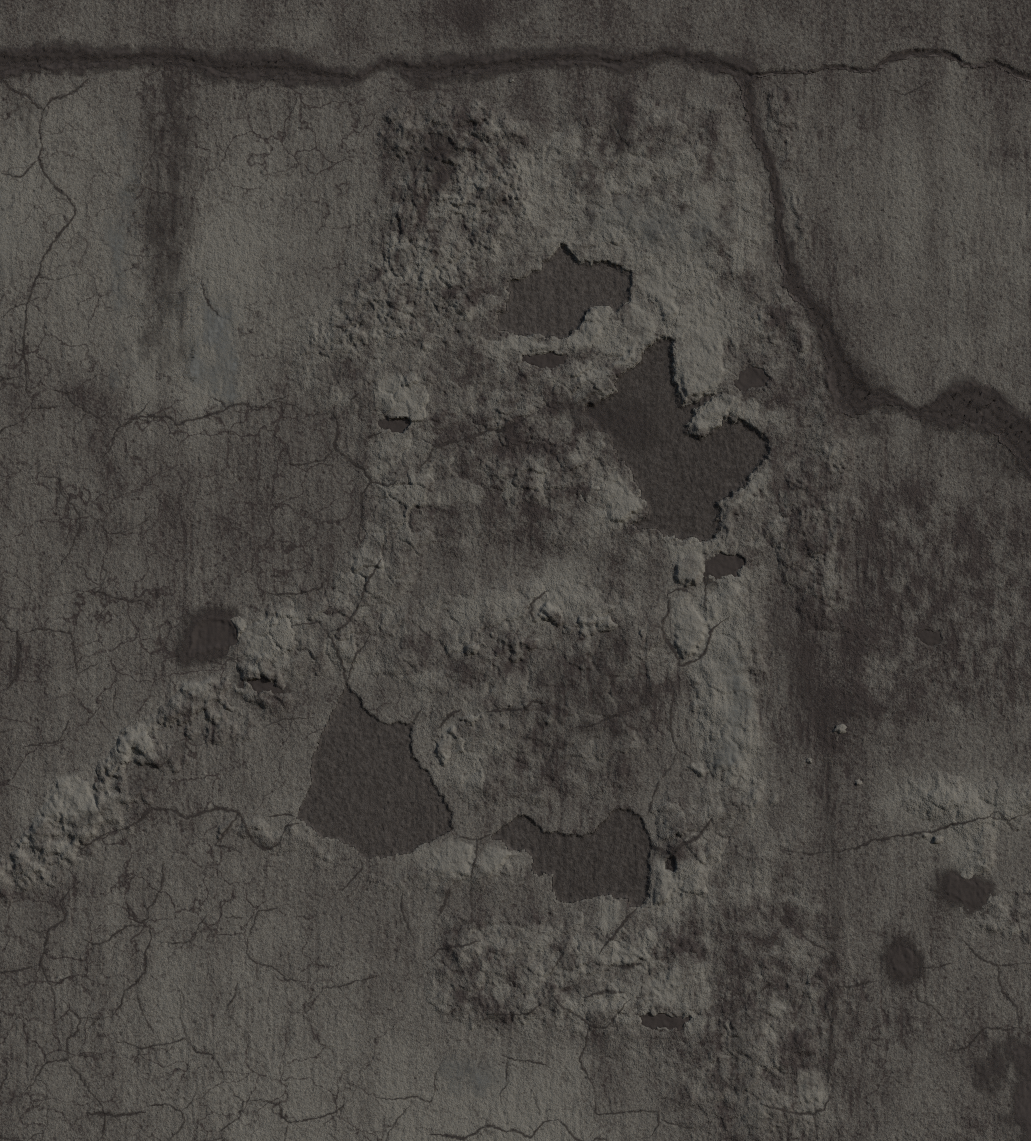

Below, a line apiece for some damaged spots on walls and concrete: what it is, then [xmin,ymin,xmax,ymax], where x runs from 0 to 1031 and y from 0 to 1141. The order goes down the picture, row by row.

spalling [268,91,1031,764]
crack [0,868,374,1141]
crack [84,807,298,852]
spalling [297,684,452,860]
crack [401,834,491,960]
crack [414,700,548,728]
crack [430,908,692,1141]
spalling [421,808,873,1141]
crack [651,818,713,864]
crack [760,936,874,1131]
crack [785,811,1016,855]
spalling [953,874,1031,951]